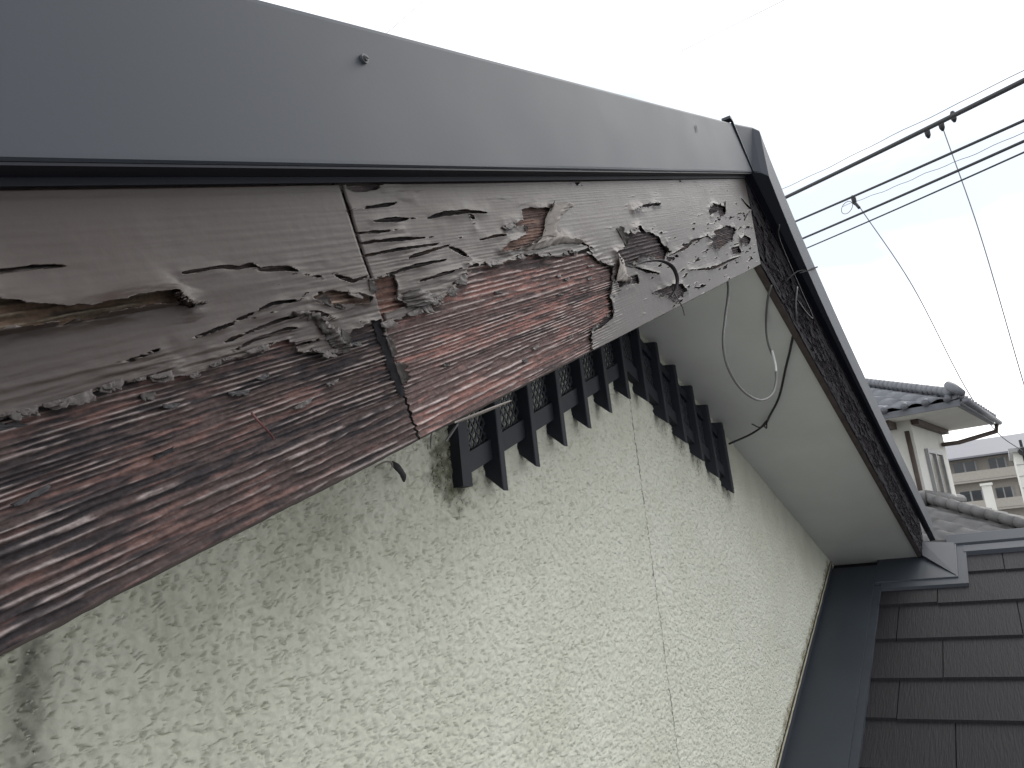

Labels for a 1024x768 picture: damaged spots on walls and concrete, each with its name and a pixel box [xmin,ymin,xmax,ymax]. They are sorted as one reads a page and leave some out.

peeling [339,186,378,196]
peeling [0,201,922,652]